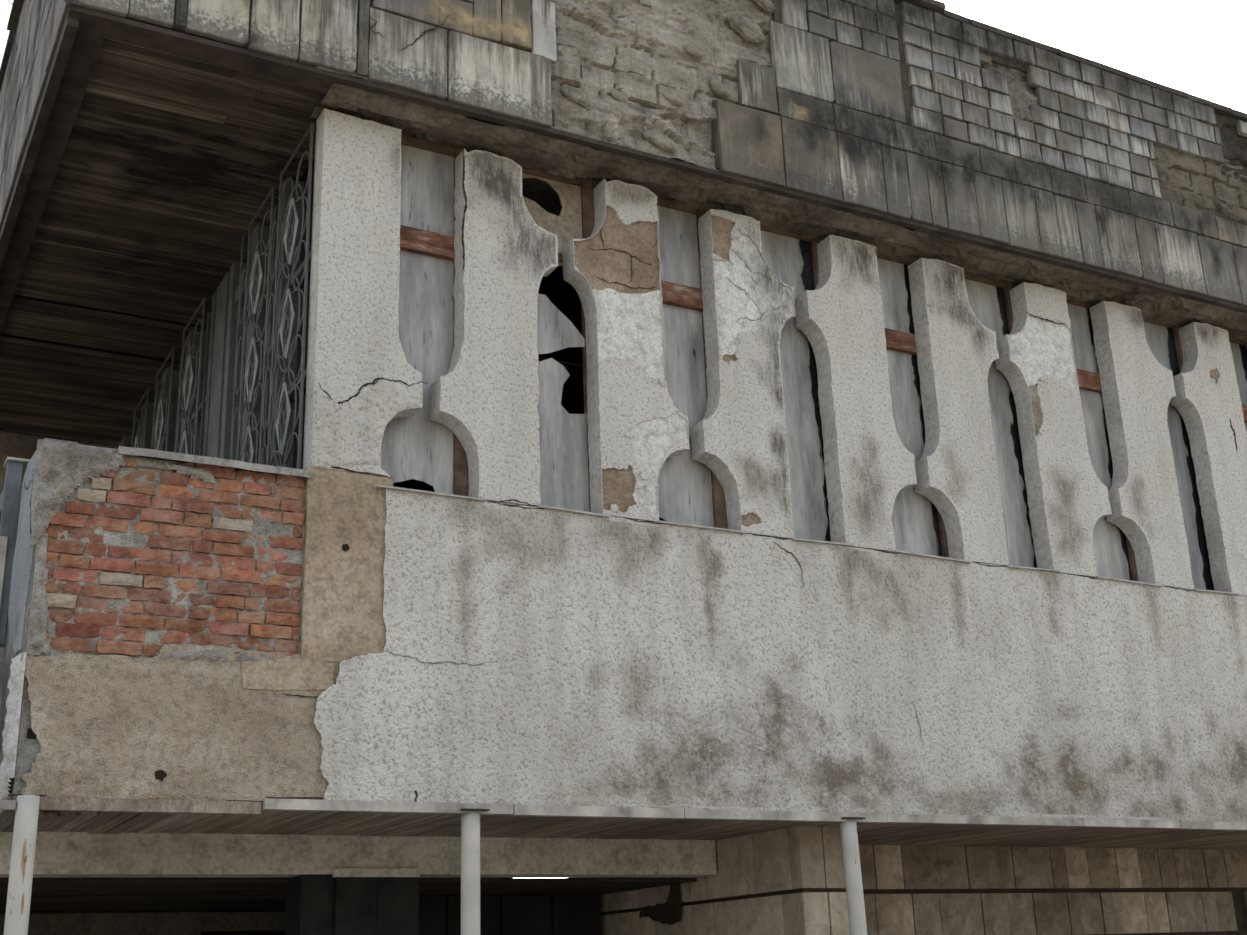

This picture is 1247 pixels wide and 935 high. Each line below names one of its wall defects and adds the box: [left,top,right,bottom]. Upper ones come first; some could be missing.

spalling [574,207,666,387]
crack [319,377,428,404]
peeling [602,412,687,514]
flaking render [0,439,393,801]
damp [755,687,787,758]
damp [687,737,724,785]
damp [818,746,893,804]
damp [1060,746,1100,813]